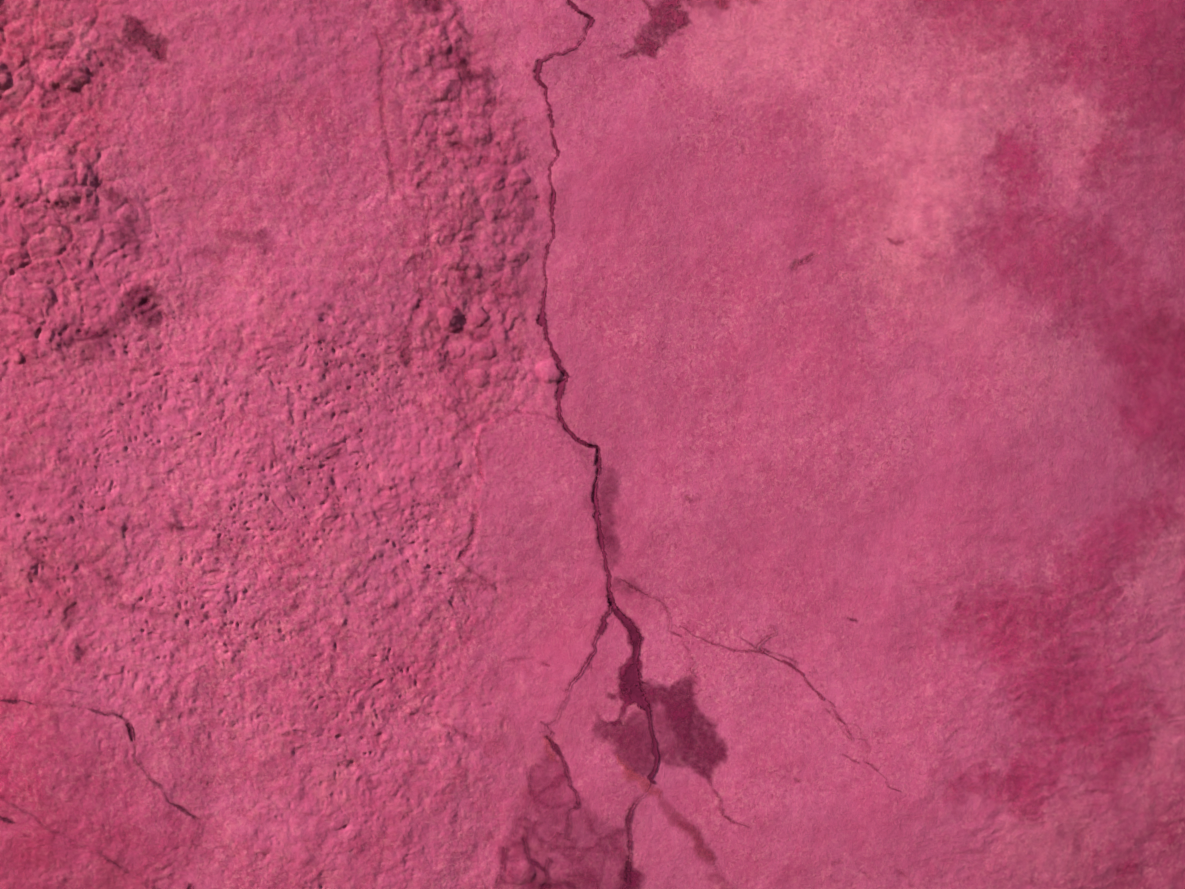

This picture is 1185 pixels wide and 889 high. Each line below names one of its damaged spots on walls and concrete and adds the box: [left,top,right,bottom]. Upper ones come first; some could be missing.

crack [534,0,659,883]
crack [108,713,196,818]
crack [496,839,550,887]
damp [519,773,641,889]
damp [603,609,726,780]
crack [664,606,896,790]